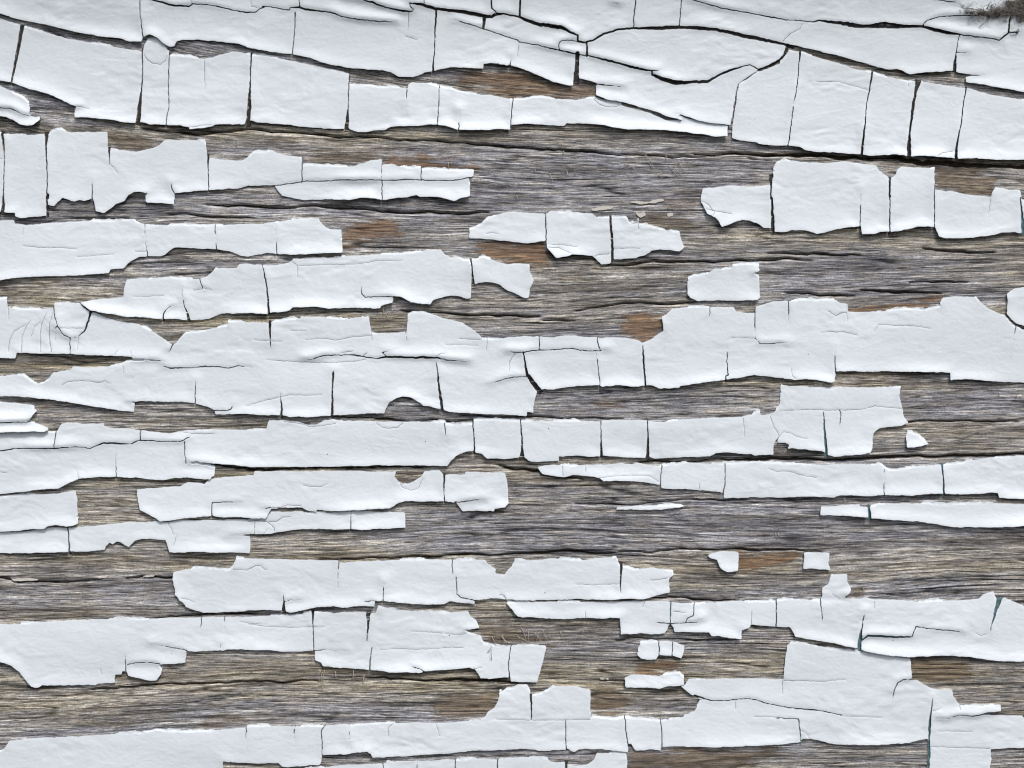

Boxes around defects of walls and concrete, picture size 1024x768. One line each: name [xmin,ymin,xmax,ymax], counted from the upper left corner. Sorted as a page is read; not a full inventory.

crack [0,25,108,257]
peeling [0,0,1024,238]
crack [92,0,1024,266]
peeling [469,199,684,264]
crack [252,507,291,536]
crack [0,253,1024,505]
peeling [0,218,1024,768]
crack [694,678,882,744]
crack [856,597,1002,651]
crack [927,705,990,768]